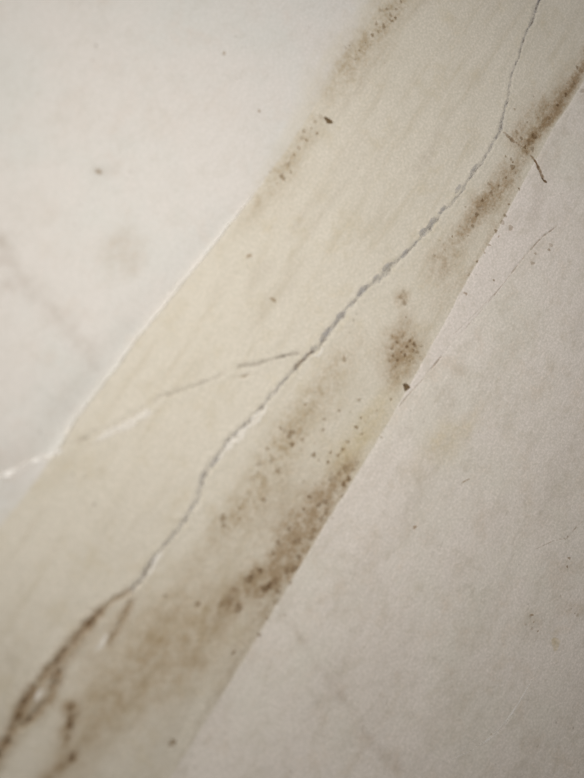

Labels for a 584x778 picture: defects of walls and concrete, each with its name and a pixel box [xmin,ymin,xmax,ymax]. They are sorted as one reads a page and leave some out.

crack [294,206,444,368]
crack [3,427,72,478]
crack [96,409,152,440]
crack [202,406,267,477]
crack [145,551,164,576]
crack [33,689,43,702]